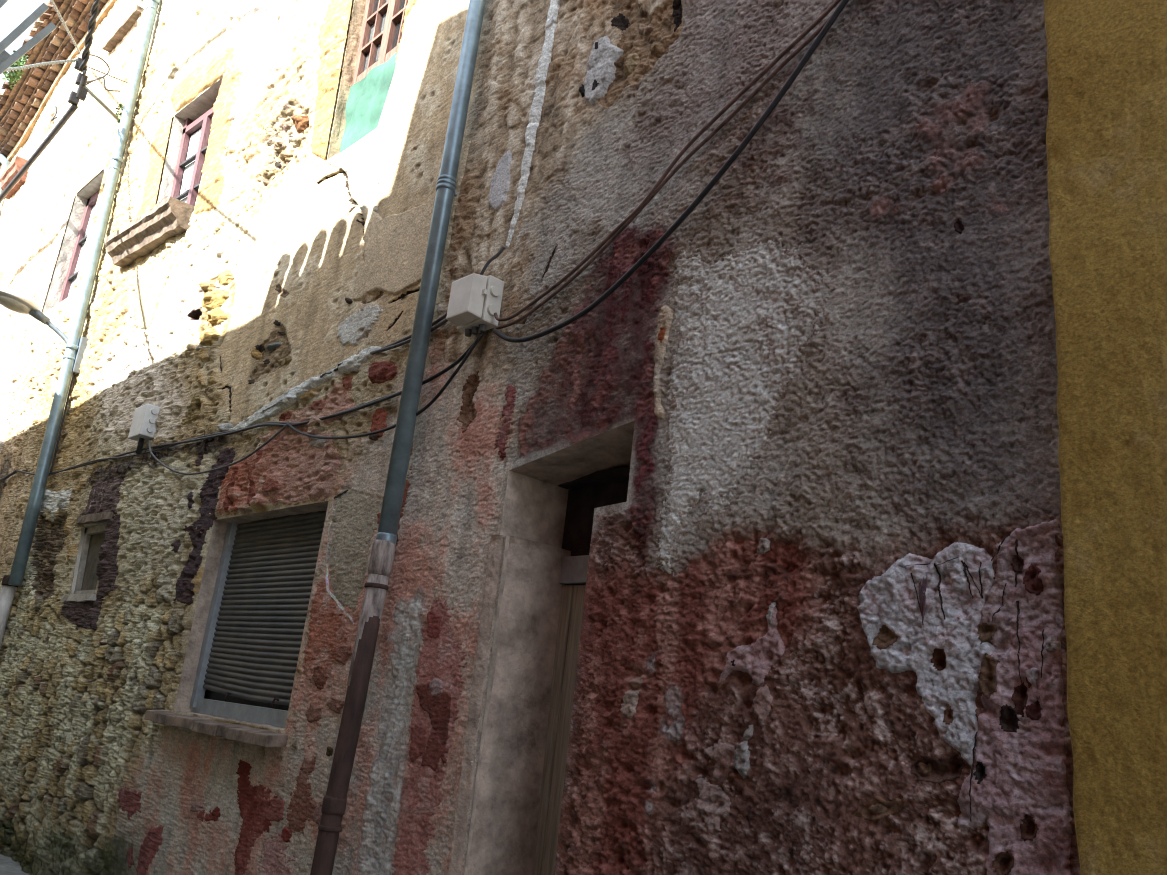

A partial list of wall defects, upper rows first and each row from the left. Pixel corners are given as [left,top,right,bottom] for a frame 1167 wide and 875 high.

spalling [579,0,684,110]
spalling [254,99,311,194]
crack [316,170,365,242]
flaking render [196,266,236,350]
spalling [248,320,292,384]
peeling [368,361,398,384]
peeling [395,443,413,553]
peeling [216,376,389,723]
peeling [857,519,1073,875]